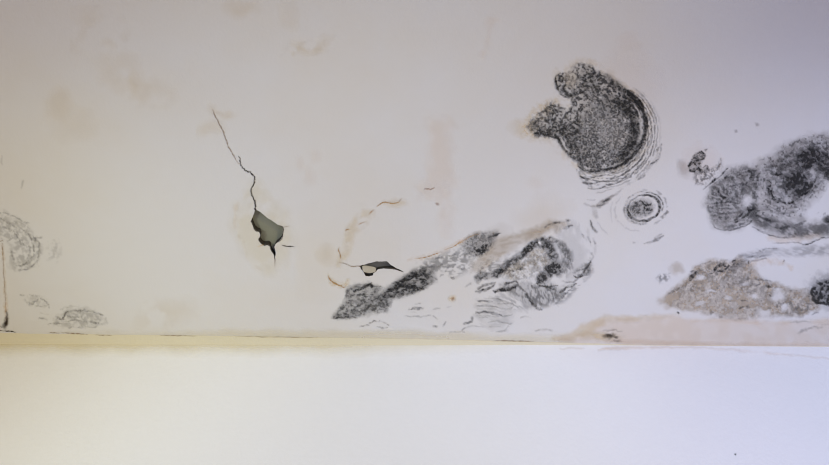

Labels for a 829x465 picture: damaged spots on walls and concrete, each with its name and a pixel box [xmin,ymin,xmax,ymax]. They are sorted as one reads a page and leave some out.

leakage [528,64,648,183]
crack [213,112,256,210]
leakage [627,192,663,222]
leakage [688,151,709,172]
leakage [710,168,787,231]
leakage [767,146,829,204]
spalling [251,210,293,259]
peeling [343,261,403,276]
leakage [336,270,430,319]
leakage [476,231,590,305]
leakage [666,260,779,314]
leakage [786,281,829,314]